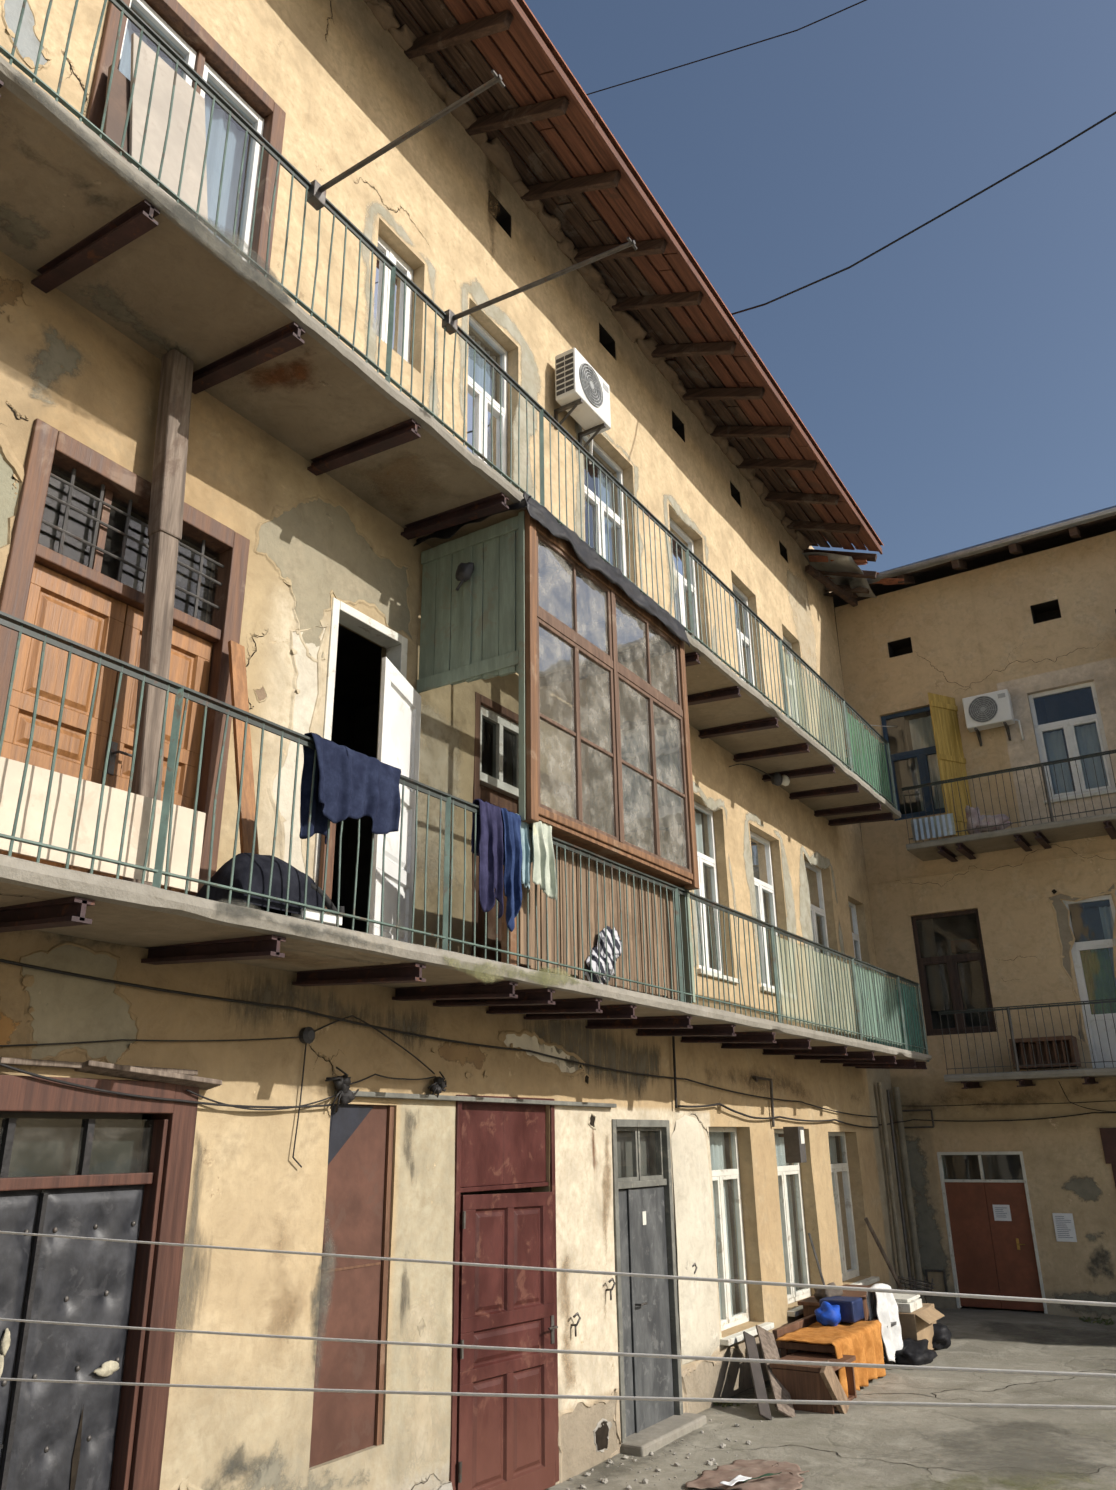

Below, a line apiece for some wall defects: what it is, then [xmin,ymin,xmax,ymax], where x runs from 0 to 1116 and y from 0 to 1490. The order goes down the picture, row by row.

flaking render [0,429,25,592]
flaking render [253,494,414,873]
flaking render [0,941,140,1070]
flaking render [431,1029,590,1086]
flaking render [169,1478,204,1490]
crack [402,1472,439,1490]